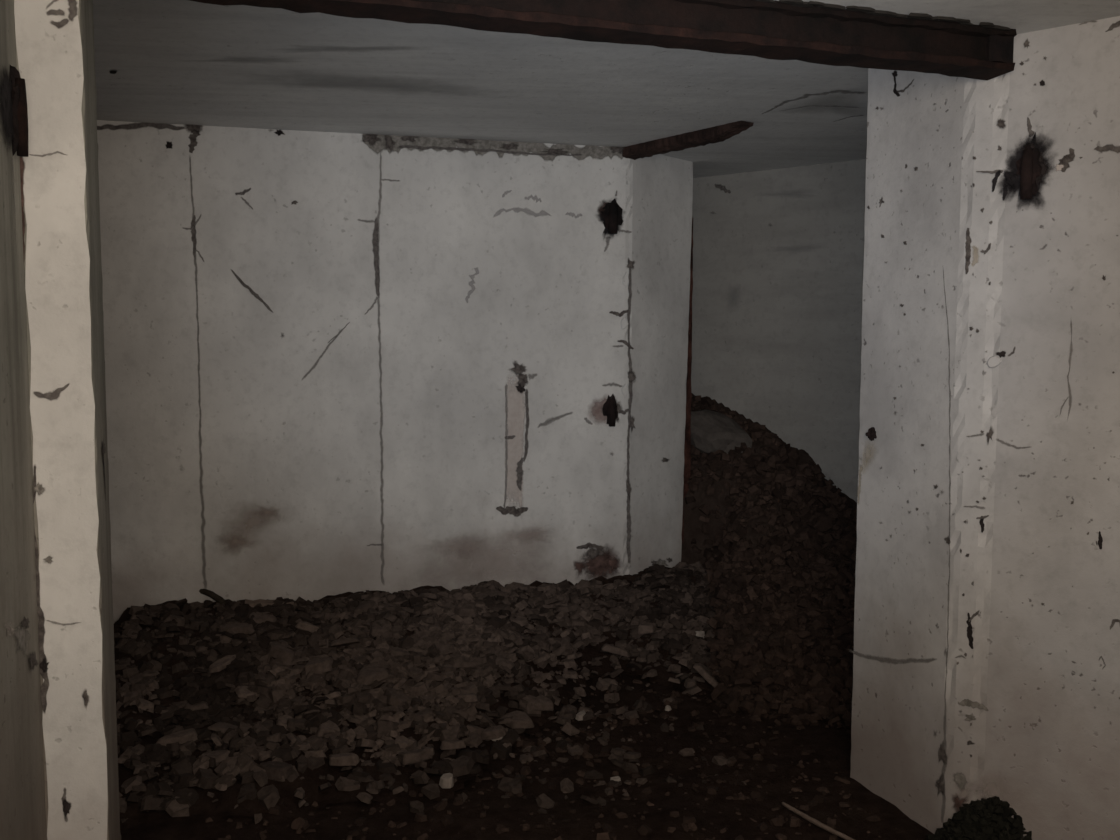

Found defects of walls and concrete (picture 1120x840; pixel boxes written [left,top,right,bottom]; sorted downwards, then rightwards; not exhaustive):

crack [97,122,185,130]
spalling [363,134,623,161]
spalling [1004,143,1082,188]
crack [235,188,253,209]
crack [231,270,273,312]
crack [183,158,207,587]
crack [303,155,400,584]
spalling [511,362,528,393]
crack [609,230,636,563]